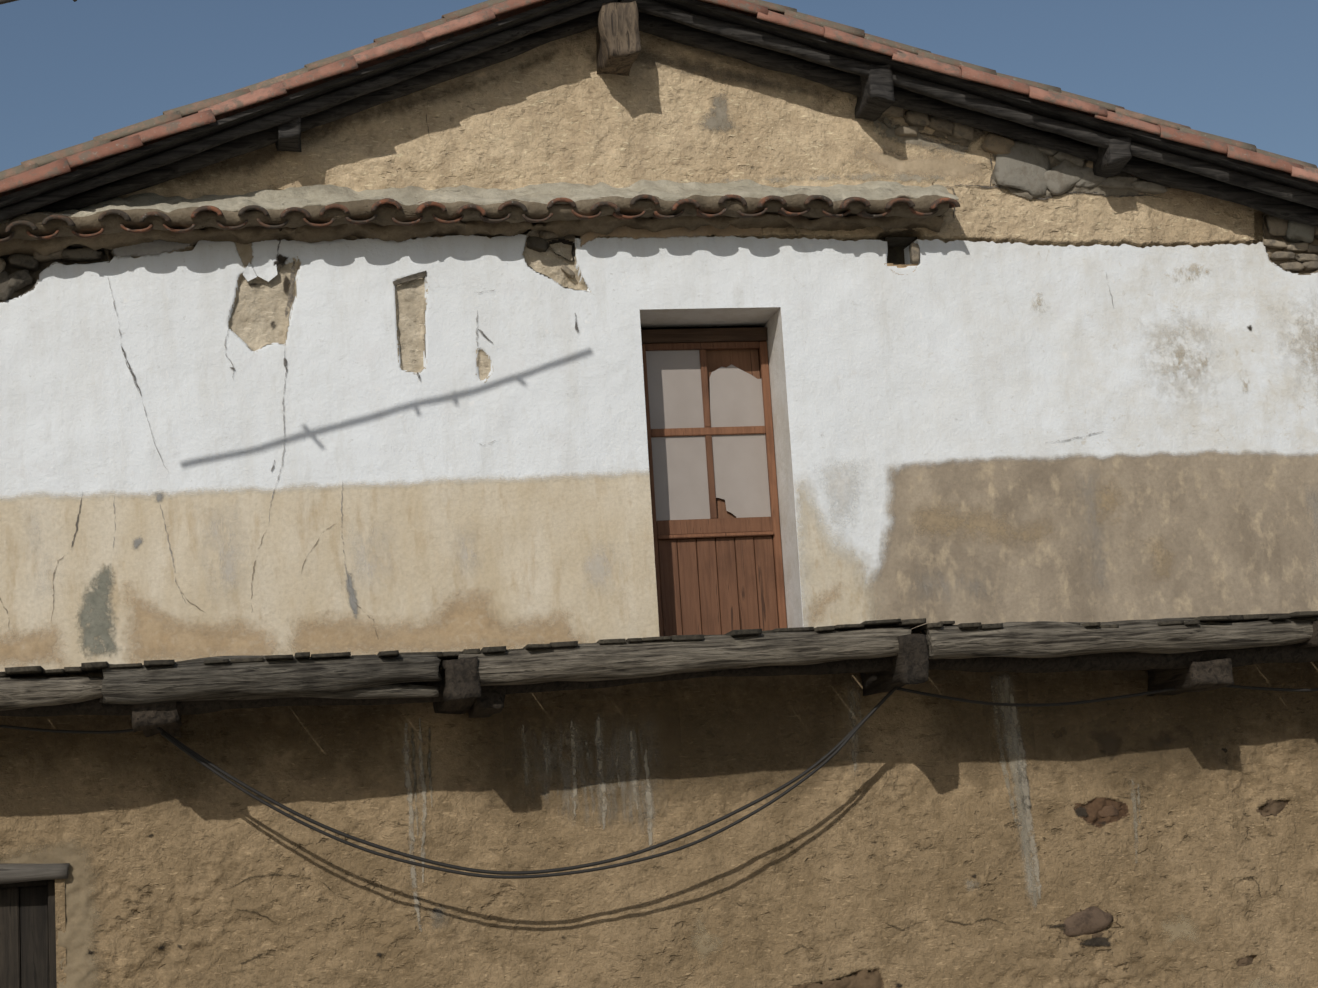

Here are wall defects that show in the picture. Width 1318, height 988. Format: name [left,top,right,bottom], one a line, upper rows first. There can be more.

flaking render [880,106,1170,200]
crack [108,279,163,461]
spalling [228,238,301,351]
spalling [393,271,429,381]
spalling [522,224,763,292]
crack [51,498,82,617]
crack [160,505,204,612]
crack [251,352,287,606]
leakage [0,473,660,672]
leakage [403,718,433,932]
leakage [484,691,835,851]
leakage [946,666,1318,905]